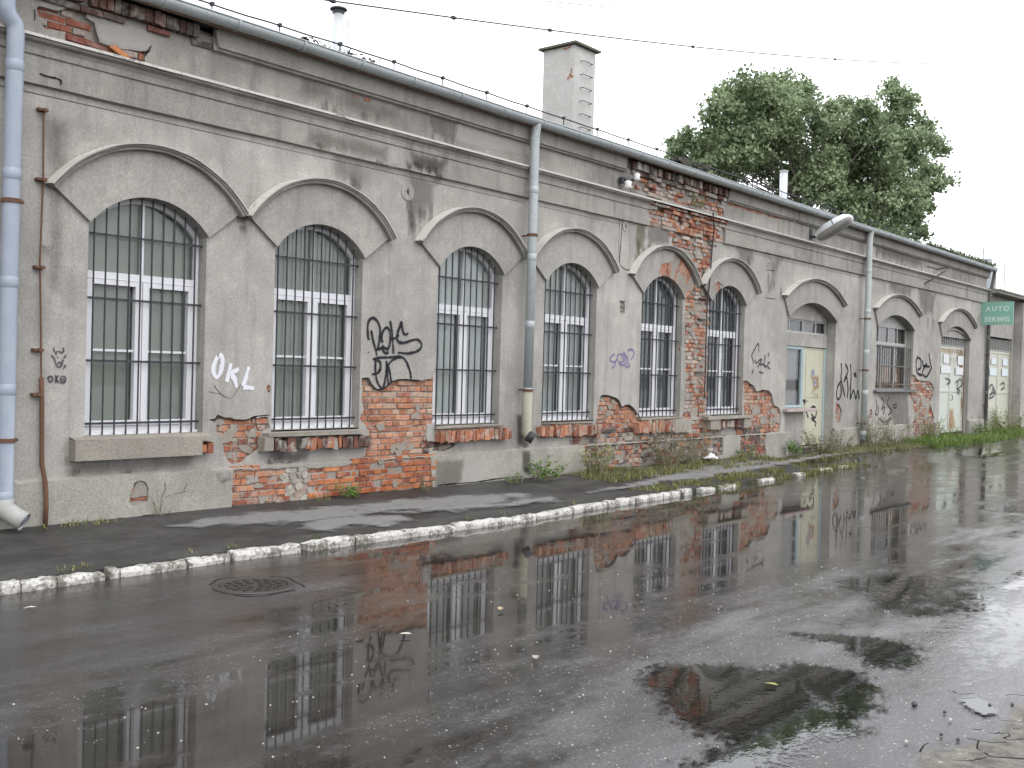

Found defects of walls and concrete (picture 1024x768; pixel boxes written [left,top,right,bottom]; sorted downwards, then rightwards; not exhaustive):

peeling [37,0,212,61]
peeling [536,159,780,470]
peeling [202,376,512,506]
peeling [909,374,933,436]